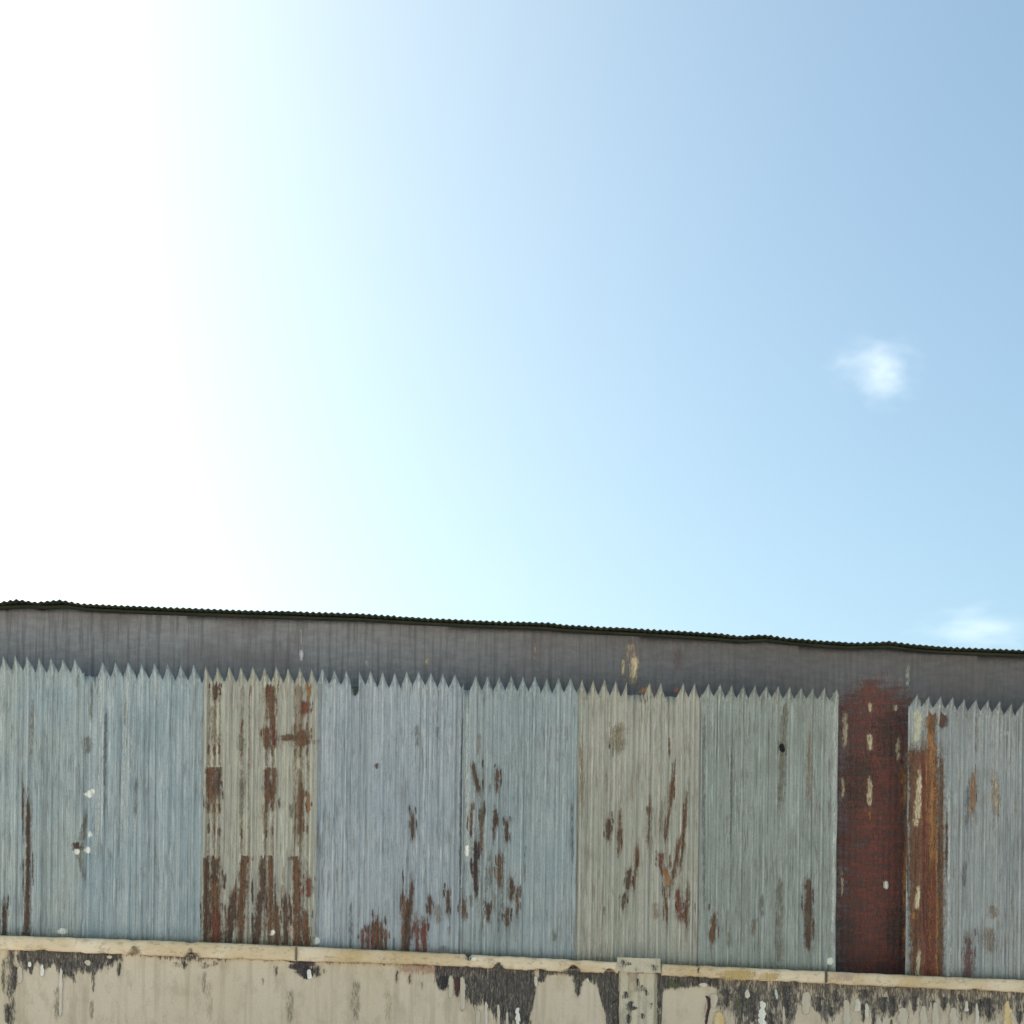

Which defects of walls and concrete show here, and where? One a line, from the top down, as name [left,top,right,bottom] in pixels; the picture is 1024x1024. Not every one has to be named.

corrosion [22,783,34,936]
flaking render [17,946,139,1017]
corrosion [200,681,317,946]
corrosion [349,760,521,952]
flaking render [402,957,619,1024]
corrosion [603,809,622,857]
corrosion [619,738,730,945]
corrosion [801,879,815,950]
flaking render [657,974,1024,1024]
corrosion [833,672,948,980]